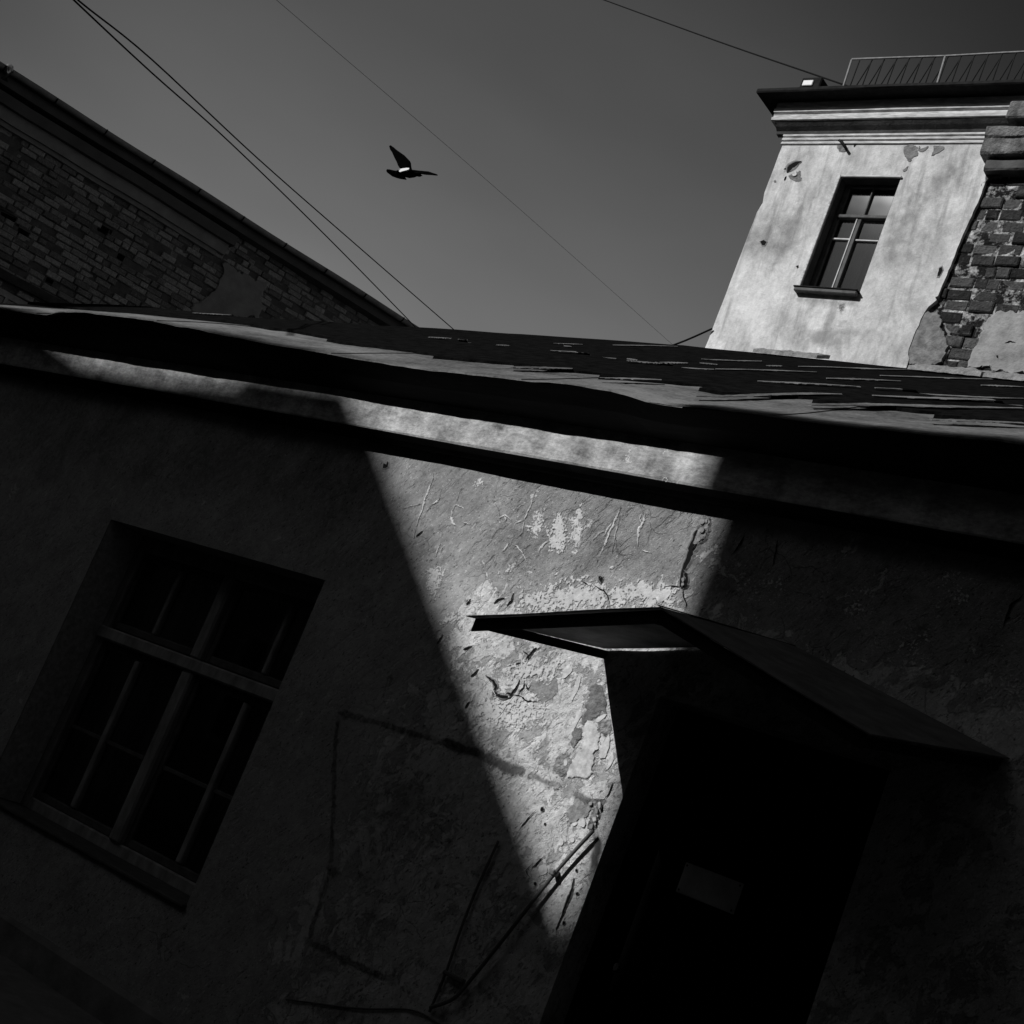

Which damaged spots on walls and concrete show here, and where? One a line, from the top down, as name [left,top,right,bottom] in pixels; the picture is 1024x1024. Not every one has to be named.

spalling [774,160,802,182]
peeling [903,144,944,172]
crack [403,476,469,558]
crack [482,491,549,578]
crack [582,508,651,598]
crack [666,515,712,610]
crack [486,647,541,719]
peeling [465,656,614,779]
peeling [558,798,606,846]